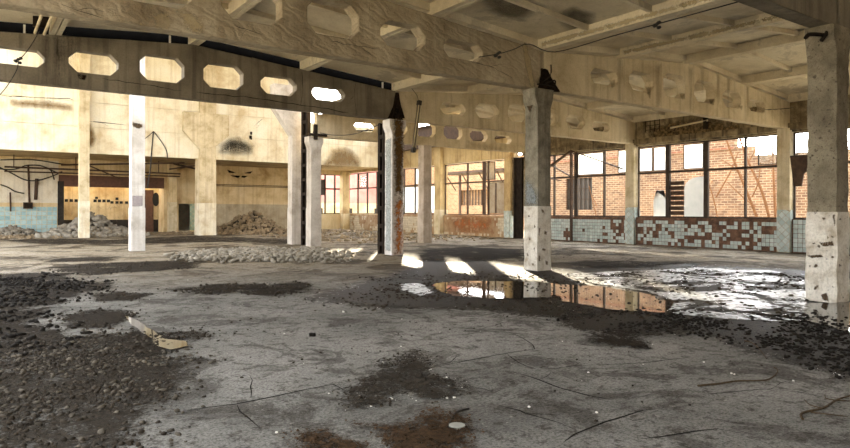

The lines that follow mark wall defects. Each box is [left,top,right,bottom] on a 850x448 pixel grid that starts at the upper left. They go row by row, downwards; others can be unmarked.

corrosion [393,198,404,255]